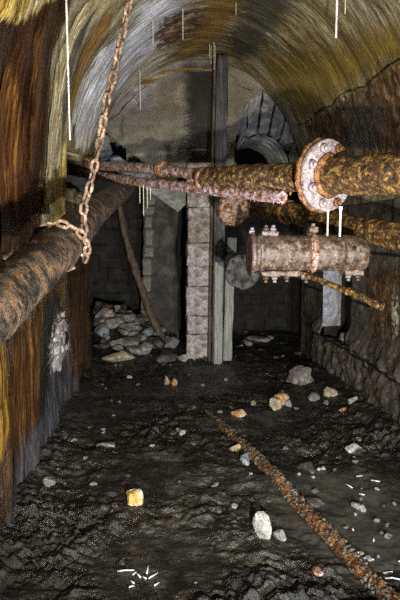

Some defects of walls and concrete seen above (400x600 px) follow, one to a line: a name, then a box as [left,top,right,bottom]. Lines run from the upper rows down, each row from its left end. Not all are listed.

damp [41,0,213,229]
crack [297,52,400,127]
damp [9,294,80,527]